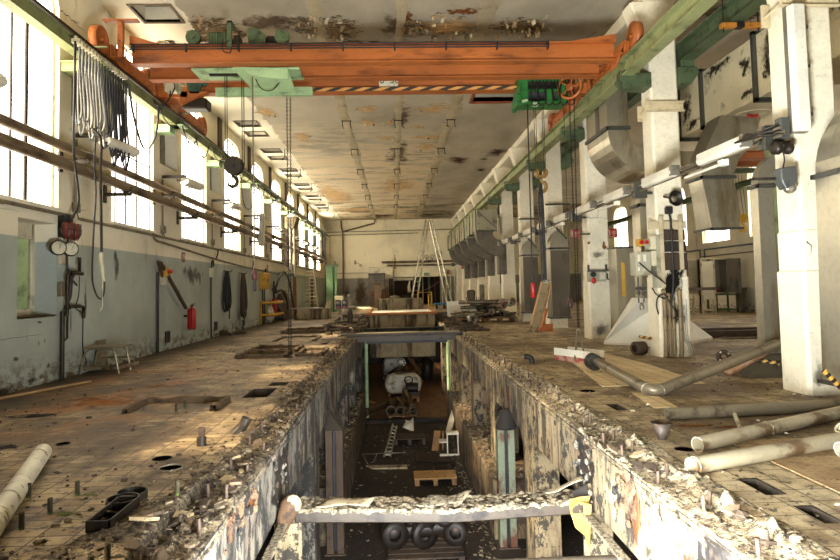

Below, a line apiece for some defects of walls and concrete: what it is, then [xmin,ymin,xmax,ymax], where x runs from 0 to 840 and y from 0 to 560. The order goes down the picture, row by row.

peeling [289,15,378,42]
peeling [402,15,552,42]
damp [704,57,729,77]
damp [762,55,770,79]
damp [683,93,699,131]
damp [665,270,686,323]
spalling [196,318,370,560]
spalling [440,336,742,560]
damp [606,478,617,524]